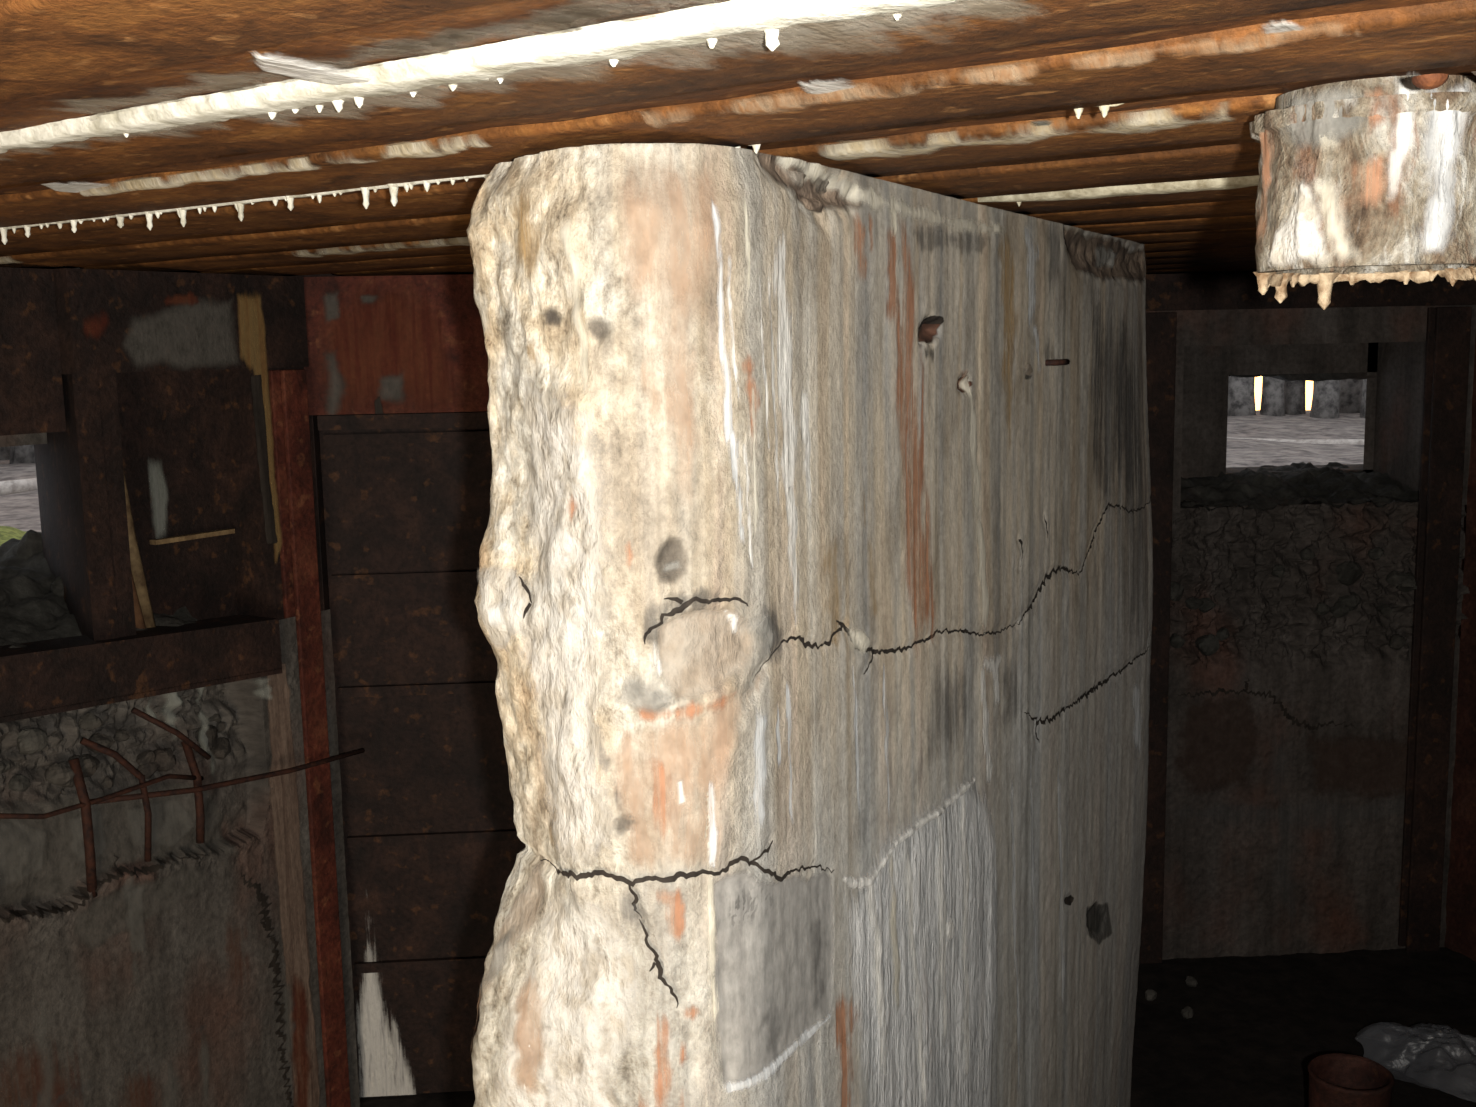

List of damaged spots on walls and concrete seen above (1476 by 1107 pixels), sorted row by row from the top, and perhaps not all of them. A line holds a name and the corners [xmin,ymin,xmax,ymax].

water stain [0,0,1021,154]
efflorescence [964,63,1033,86]
efflorescence [1073,51,1112,70]
efflorescence [1180,22,1337,54]
efflorescence [42,158,317,196]
efflorescence [388,138,484,158]
water stain [0,174,489,264]
crack [643,596,748,644]
crack [752,498,1152,683]
crack [1025,632,1151,741]
crack [540,840,834,1007]
rust [655,1025,684,1100]